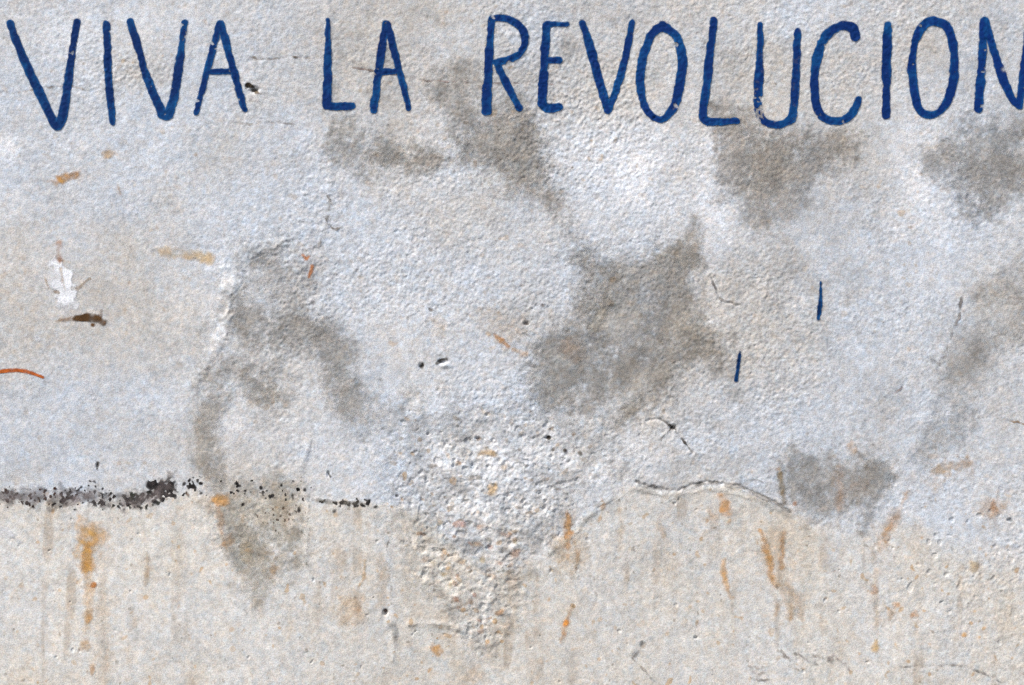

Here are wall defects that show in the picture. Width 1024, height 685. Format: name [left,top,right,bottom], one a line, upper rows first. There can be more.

leakage [327,119,442,176]
leakage [458,112,559,208]
leakage [707,103,859,228]
leakage [921,118,1024,221]
peeling [48,257,90,311]
leakage [231,297,369,418]
leakage [526,228,724,425]
leakage [0,366,306,605]
leakage [319,498,377,512]
crack [636,481,791,513]
leakage [778,445,893,534]
corrosion [80,528,98,588]